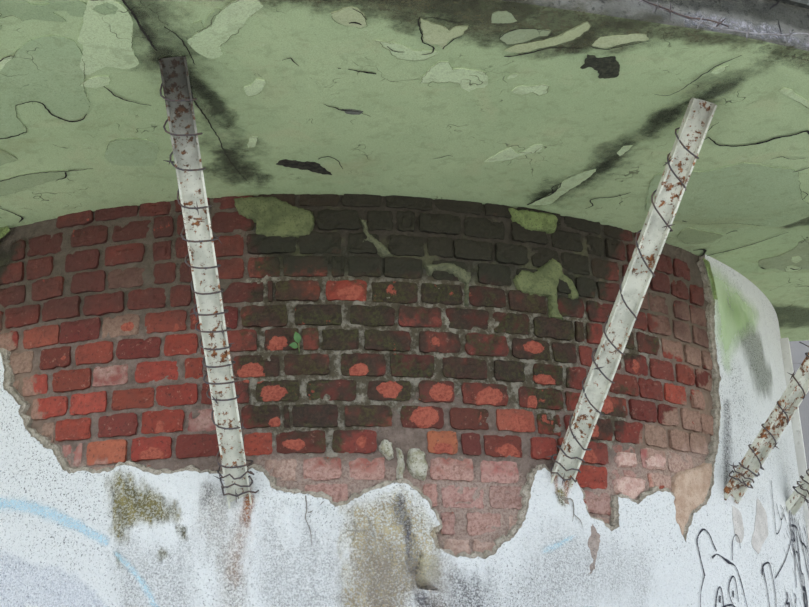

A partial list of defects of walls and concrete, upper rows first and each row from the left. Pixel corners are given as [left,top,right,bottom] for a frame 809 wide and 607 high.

peeling [0,0,139,88]
crack [122,0,195,64]
water stain [260,0,809,66]
spalling [580,34,649,79]
crack [191,91,250,183]
crack [704,122,809,172]
spalling [0,199,223,475]
spalling [207,169,640,559]
spalling [575,163,809,574]
water stain [110,472,186,540]
water stain [342,493,442,607]
water stain [452,575,484,607]